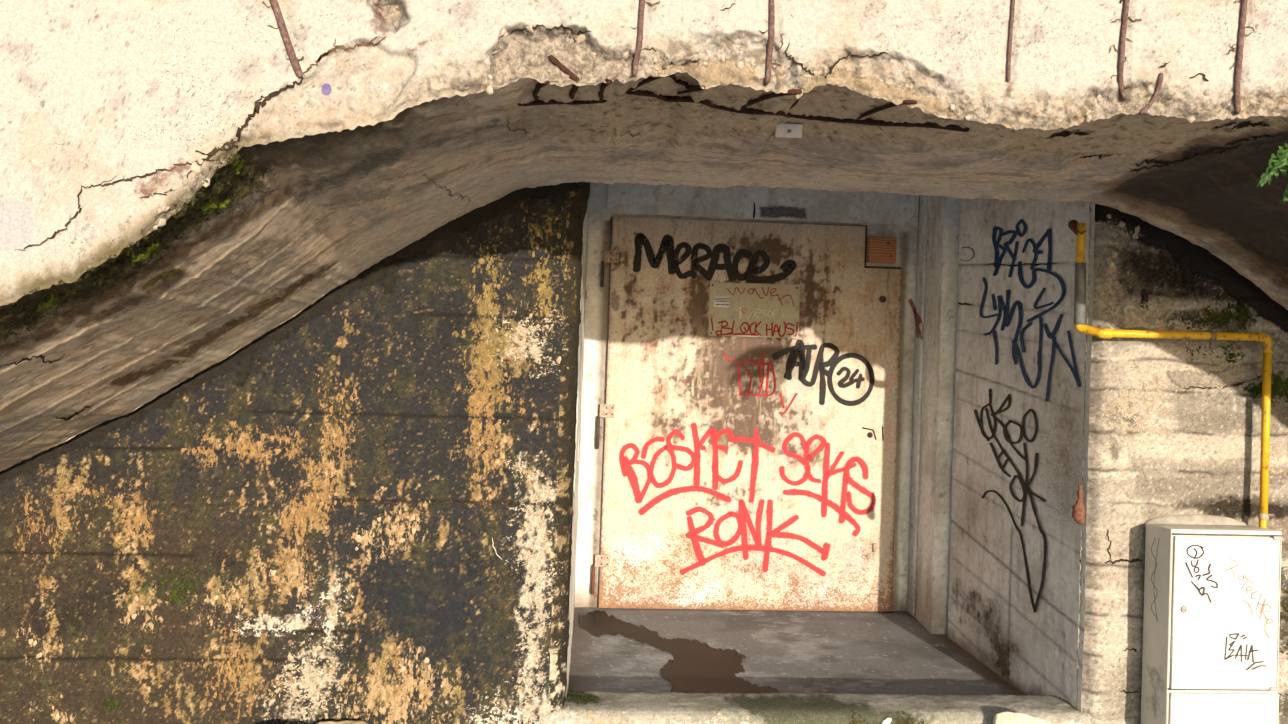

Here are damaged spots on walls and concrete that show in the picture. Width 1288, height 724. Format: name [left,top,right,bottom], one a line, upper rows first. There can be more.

crack [15,1,387,251]
spalling [269,0,303,78]
spalling [372,0,399,26]
spalling [485,0,970,132]
spalling [1006,0,1015,82]
spalling [1085,0,1218,123]
spalling [1234,0,1248,114]
water stain [0,120,502,355]
water stain [0,182,585,481]
water stain [1035,203,1288,524]
water stain [233,455,919,724]
crack [1105,530,1143,564]